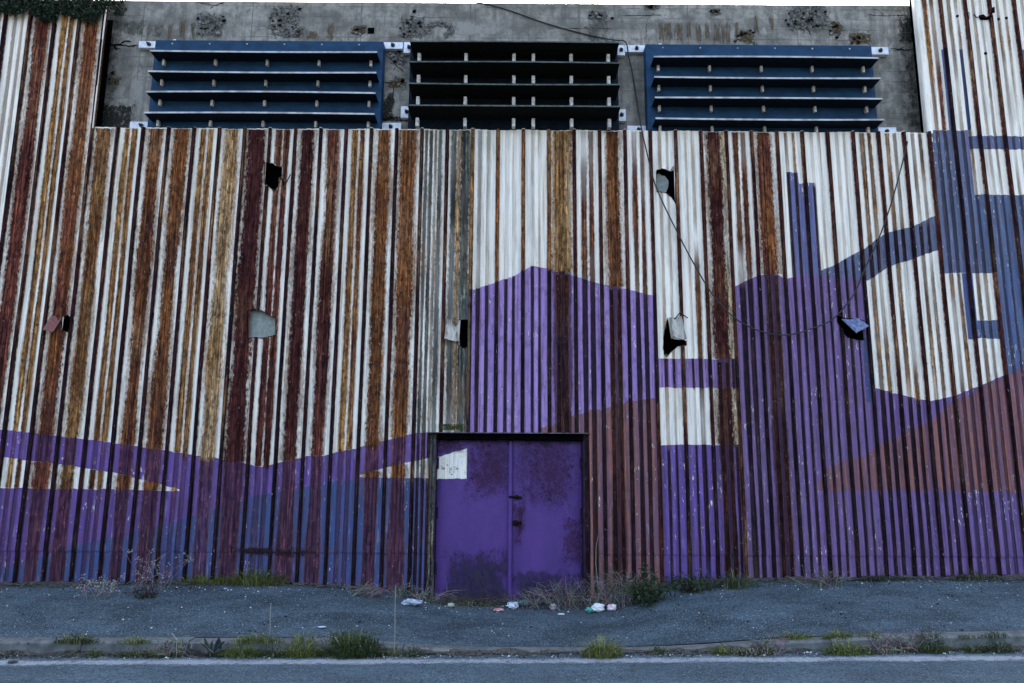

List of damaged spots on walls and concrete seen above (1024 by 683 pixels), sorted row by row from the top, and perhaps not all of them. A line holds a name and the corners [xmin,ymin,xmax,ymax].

spalling [196,12,226,38]
spalling [268,4,304,40]
spalling [784,3,873,45]
corrosion [0,3,515,598]
corrosion [513,0,1024,598]